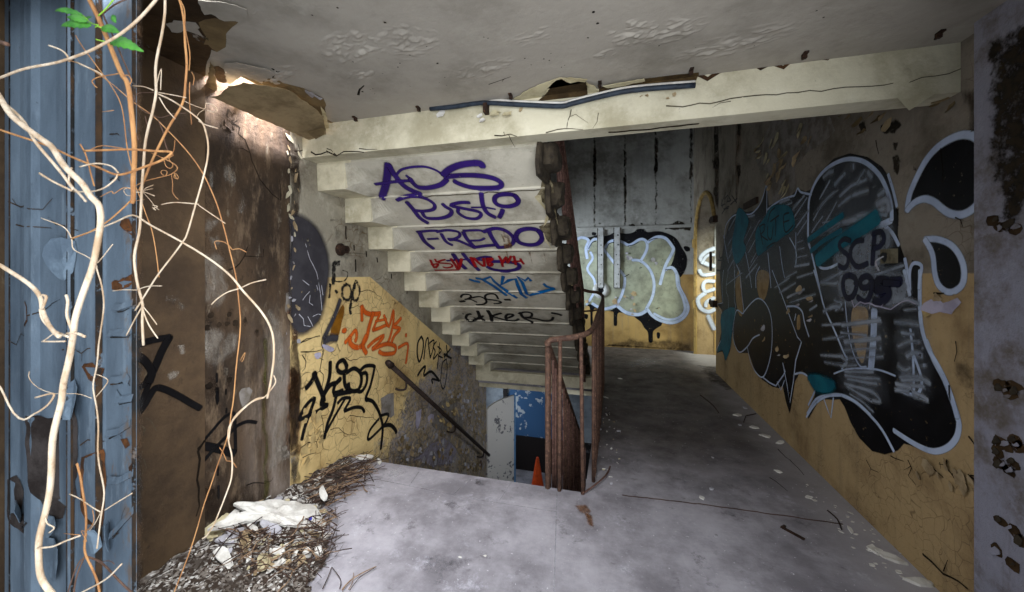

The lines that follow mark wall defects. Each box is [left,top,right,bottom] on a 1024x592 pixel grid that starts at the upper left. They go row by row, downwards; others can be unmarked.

crack [666,64,961,108]
water stain [988,26,1024,220]
spalling [535,180,558,249]
peeling [111,274,134,291]
peeling [993,378,1024,400]
peeling [7,379,109,582]
crack [866,456,974,485]
peeling [991,434,1024,478]
peeling [993,515,1024,548]
peeling [989,542,1020,574]